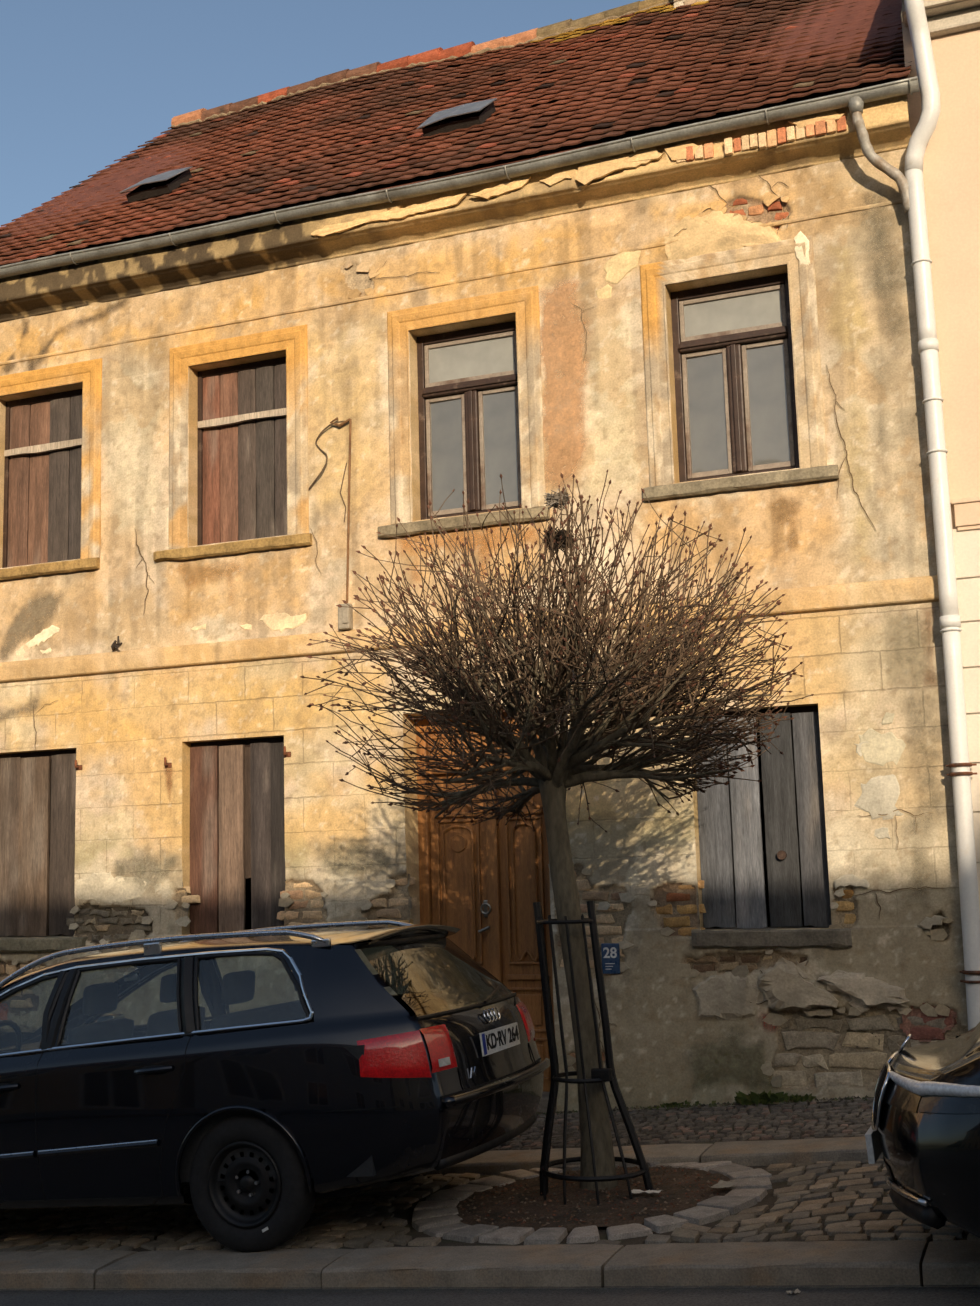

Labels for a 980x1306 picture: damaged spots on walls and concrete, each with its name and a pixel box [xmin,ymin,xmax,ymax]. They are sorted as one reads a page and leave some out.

flaking render [311,110,847,237]
crack [826,365,876,531]
crack [134,529,155,615]
spalling [66,871,200,982]
spalling [277,879,329,932]
spalling [357,874,417,929]
spalling [574,864,706,980]
spalling [829,874,870,929]
spalling [0,960,46,1029]
spalling [674,949,968,1091]